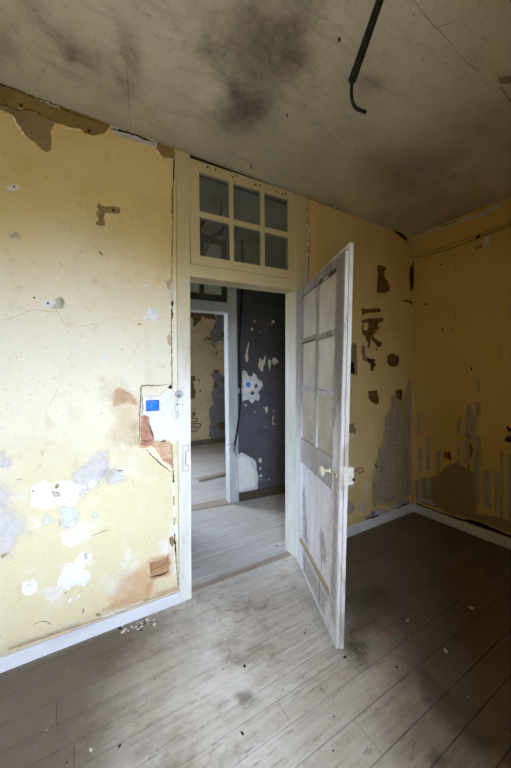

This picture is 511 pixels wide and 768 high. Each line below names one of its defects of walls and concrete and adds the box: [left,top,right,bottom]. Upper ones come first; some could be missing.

crack [414,0,478,72]
peeling [0,84,110,152]
crack [497,75,511,102]
peeling [96,203,120,226]
crack [0,153,175,447]
peeling [377,265,390,293]
peeling [351,308,383,375]
peeling [387,353,399,367]
peeling [368,390,379,404]
peeling [140,397,172,472]
peeling [415,443,511,533]
spalling [148,556,171,580]